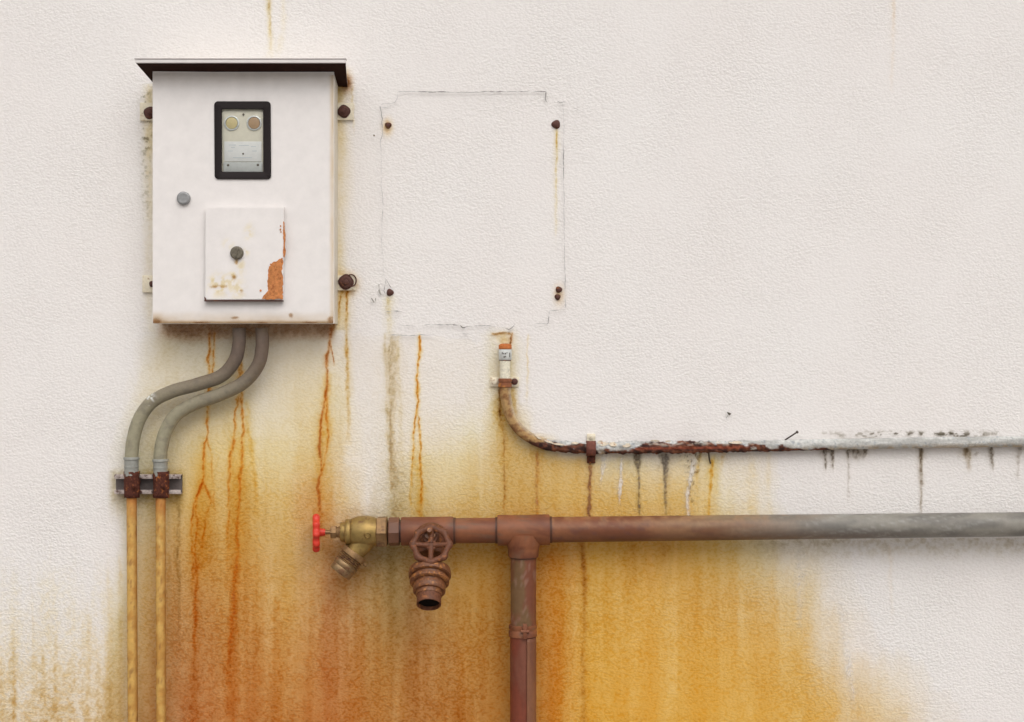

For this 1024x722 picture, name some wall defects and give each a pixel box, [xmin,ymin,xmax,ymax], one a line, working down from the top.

crack [380,91,582,336]
rust [166,549,511,722]